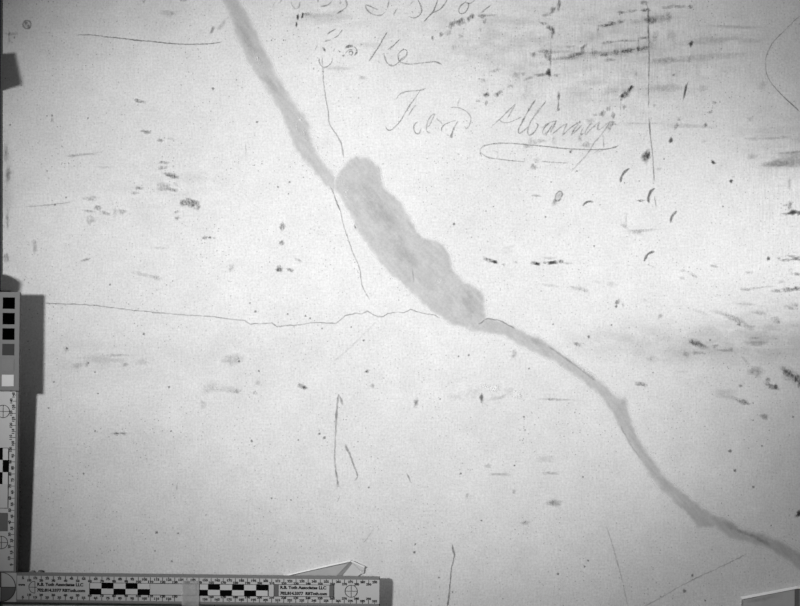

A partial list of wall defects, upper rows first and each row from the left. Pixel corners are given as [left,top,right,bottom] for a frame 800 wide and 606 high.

crack [221,0,800,572]